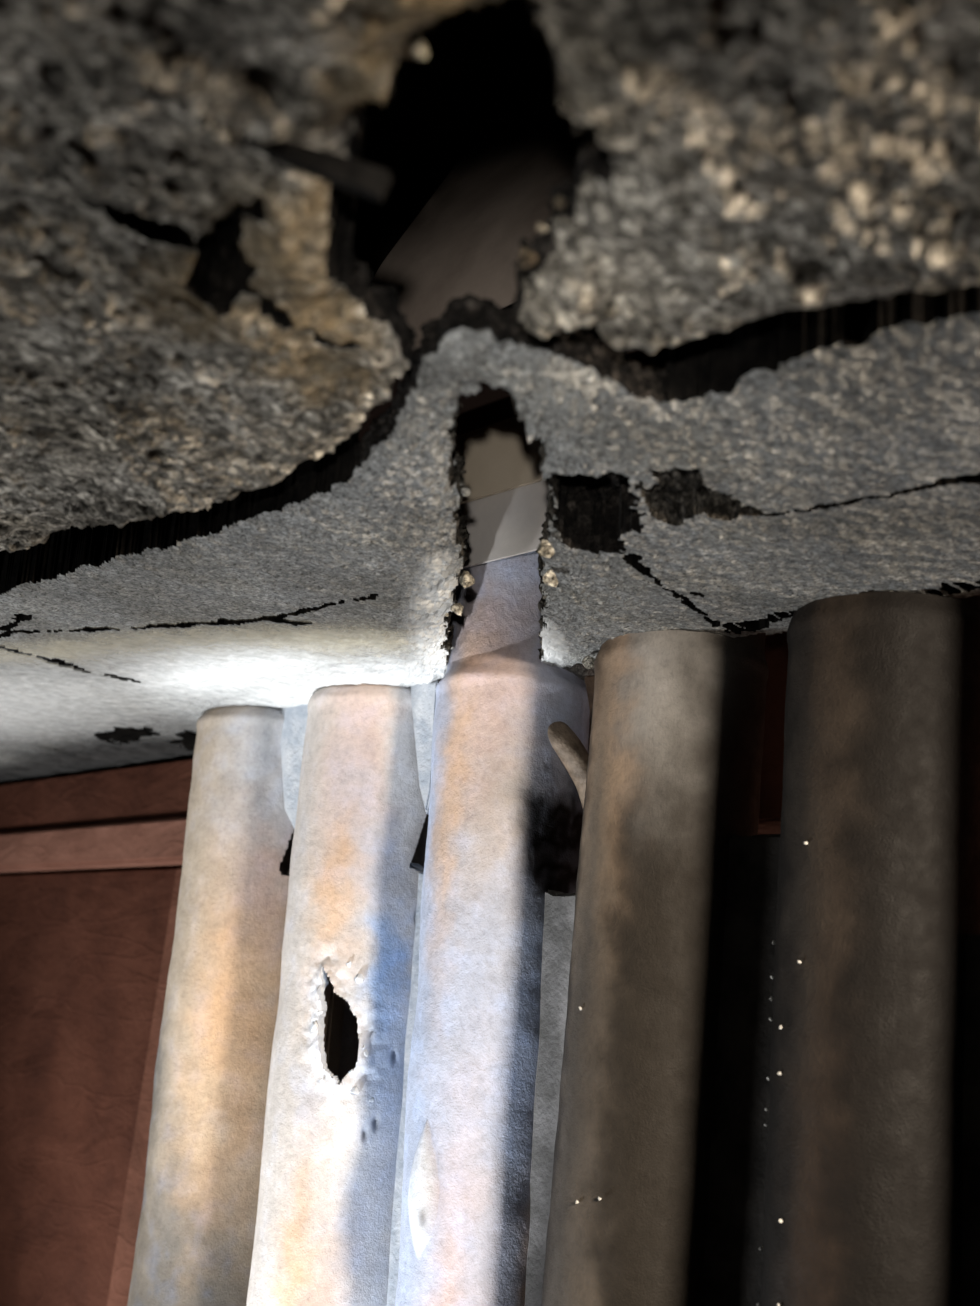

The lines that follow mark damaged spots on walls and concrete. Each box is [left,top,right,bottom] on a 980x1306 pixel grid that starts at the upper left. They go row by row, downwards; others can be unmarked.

hole [184,199,258,317]
crack [669,282,980,402]
spalling [544,468,764,554]
crack [760,473,980,517]
crack [0,432,378,681]
crack [622,553,794,634]
crack [925,581,980,596]